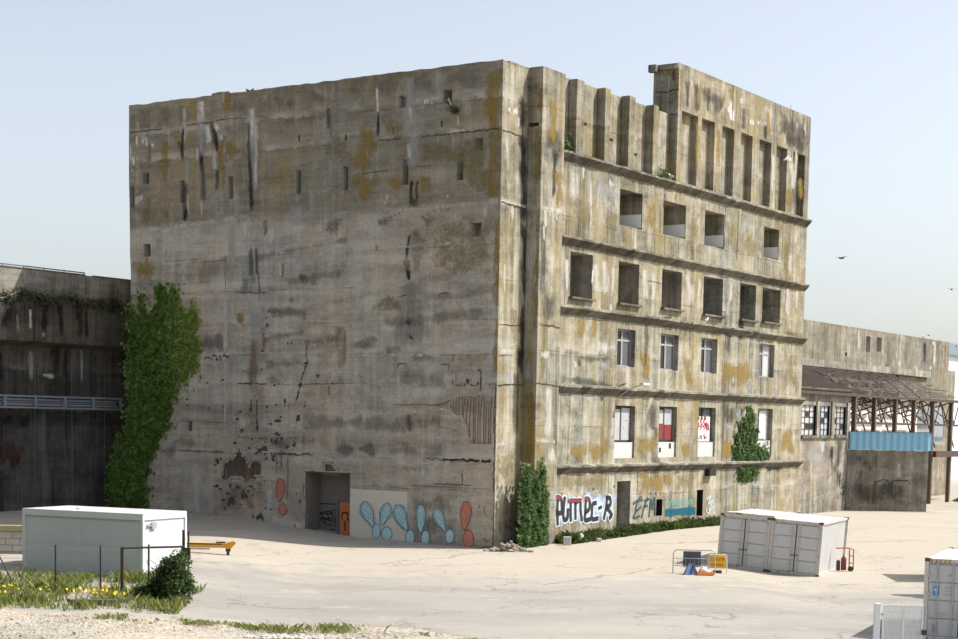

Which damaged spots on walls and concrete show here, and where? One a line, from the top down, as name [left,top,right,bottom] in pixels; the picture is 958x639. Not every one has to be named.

damp [136,101,283,271]
damp [570,167,617,226]
damp [384,98,561,430]
damp [592,261,614,292]
spalling [213,399,305,510]
crack [296,340,337,400]
spalling [449,369,497,447]
crack [410,383,559,546]
damp [537,388,556,462]
damp [574,341,615,369]